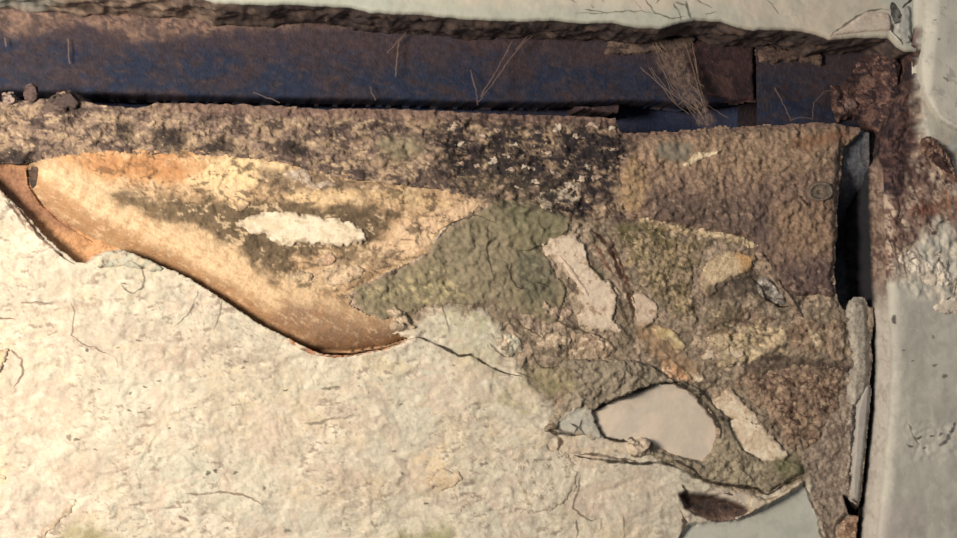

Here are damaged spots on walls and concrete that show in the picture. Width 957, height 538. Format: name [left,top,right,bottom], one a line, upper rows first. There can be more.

damp [0,148,33,166]
mould [154,129,186,151]
mould [207,138,232,152]
damp [285,141,306,154]
mould [432,113,630,219]
peeling [620,53,902,298]
flaking render [0,150,621,360]
crack [591,230,634,326]
crack [415,302,615,388]
peeling [553,292,789,462]
peeling [680,480,822,538]
flaking render [837,515,859,538]